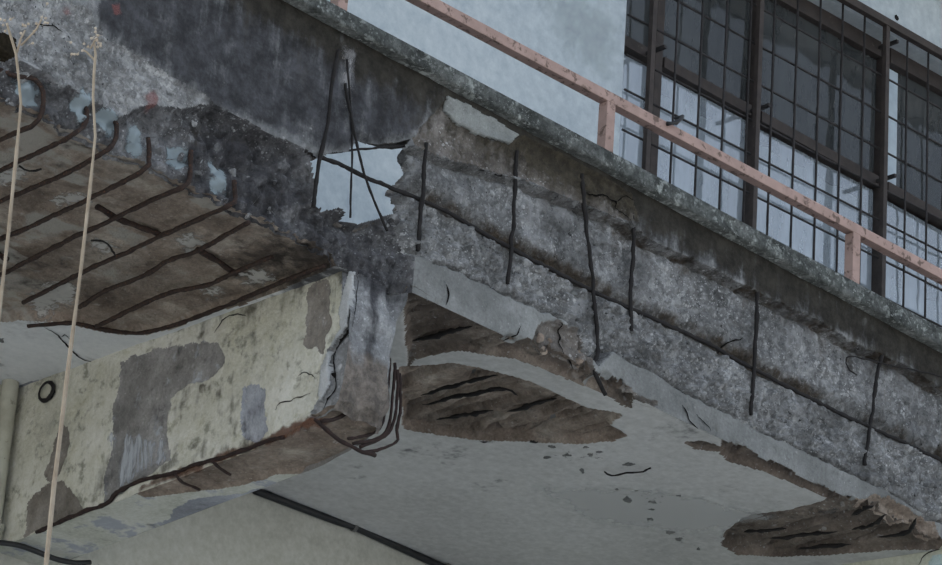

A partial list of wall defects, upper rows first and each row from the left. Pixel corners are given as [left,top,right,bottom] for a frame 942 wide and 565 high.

peeling [23,426,70,538]
spalling [0,56,336,335]
rust [249,417,327,449]
spalling [95,49,942,542]